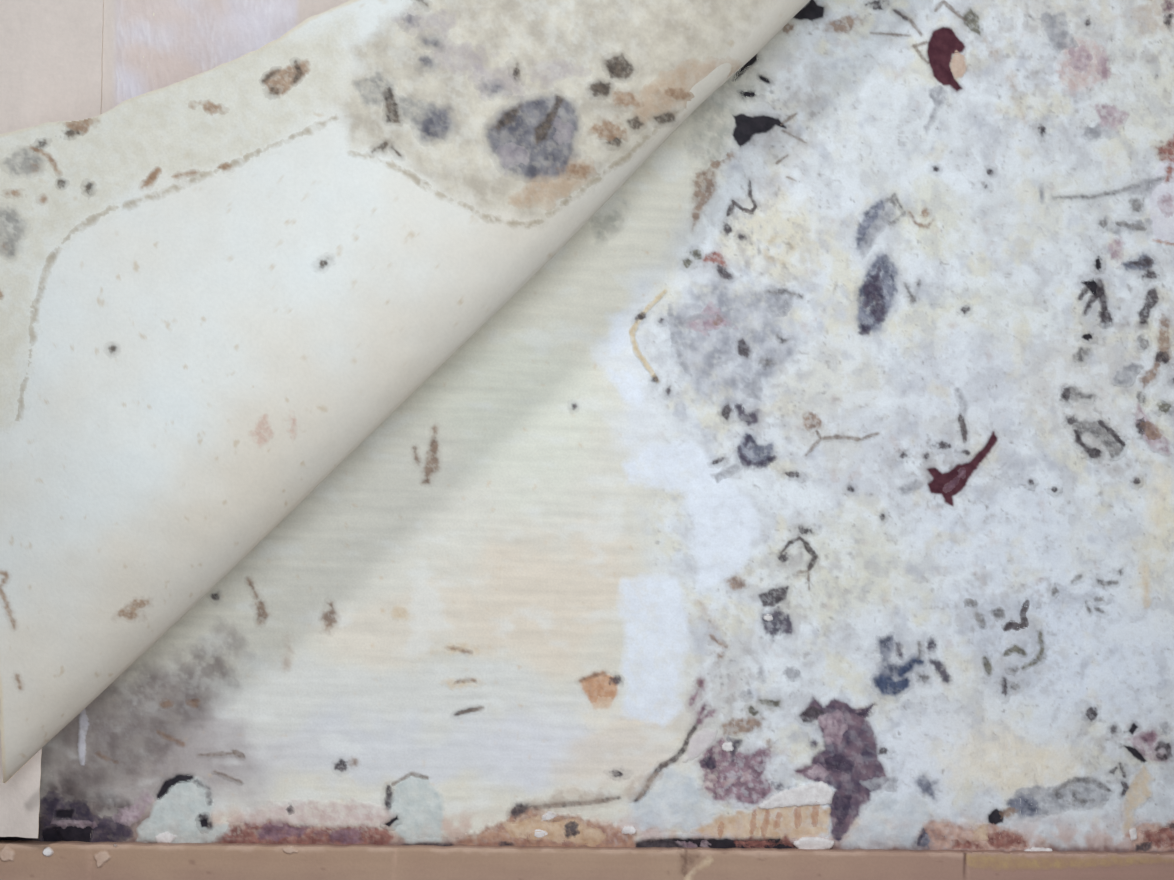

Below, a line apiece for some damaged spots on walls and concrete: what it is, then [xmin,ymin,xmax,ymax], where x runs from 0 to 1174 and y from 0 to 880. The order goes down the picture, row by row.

spalling [868,18,969,136]
peeling [1147,129,1174,248]
spalling [676,245,738,284]
peeling [628,288,675,403]
spalling [923,427,1002,511]
leakage [0,588,258,842]
leakage [379,811,404,831]
spalling [135,765,728,880]
leakage [657,831,797,849]
leakage [910,825,930,850]
spalling [788,692,1053,852]
spalling [1121,817,1174,852]